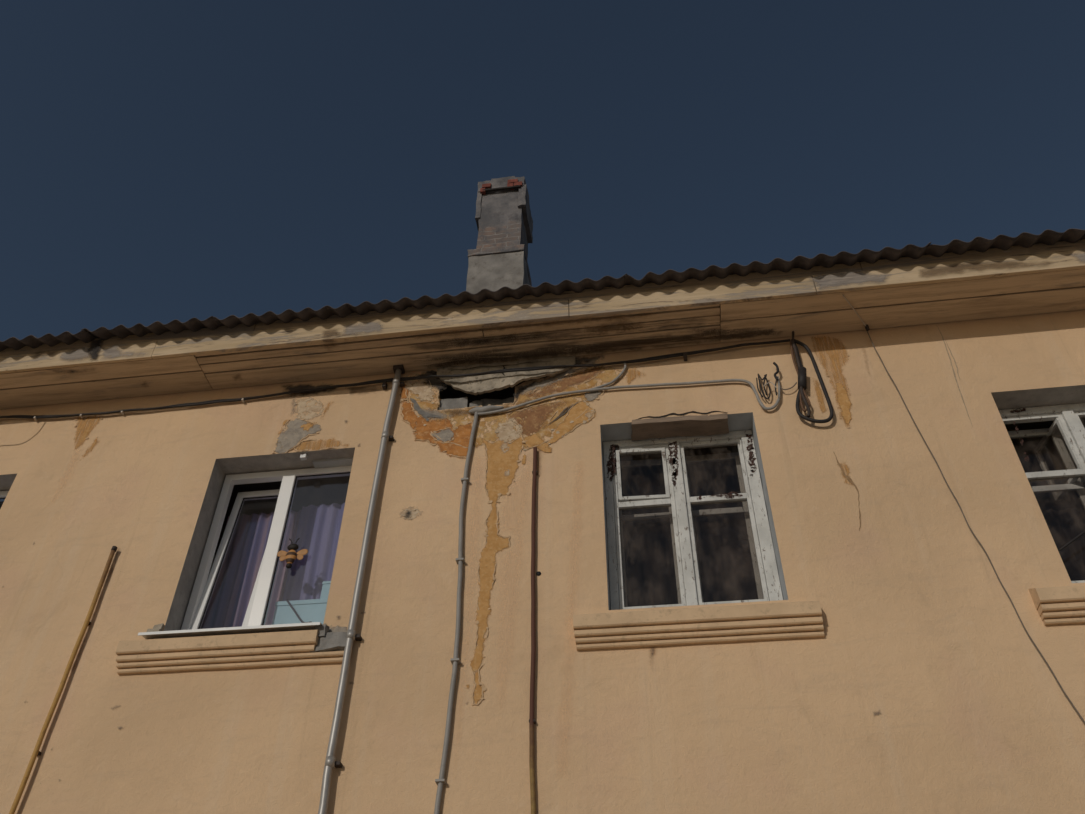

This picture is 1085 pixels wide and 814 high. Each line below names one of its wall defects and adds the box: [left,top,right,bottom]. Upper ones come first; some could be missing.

damp [418,315,773,390]
peeling [74,415,102,456]
peeling [273,398,360,454]
crack [834,453,861,531]
peeling [399,358,640,706]